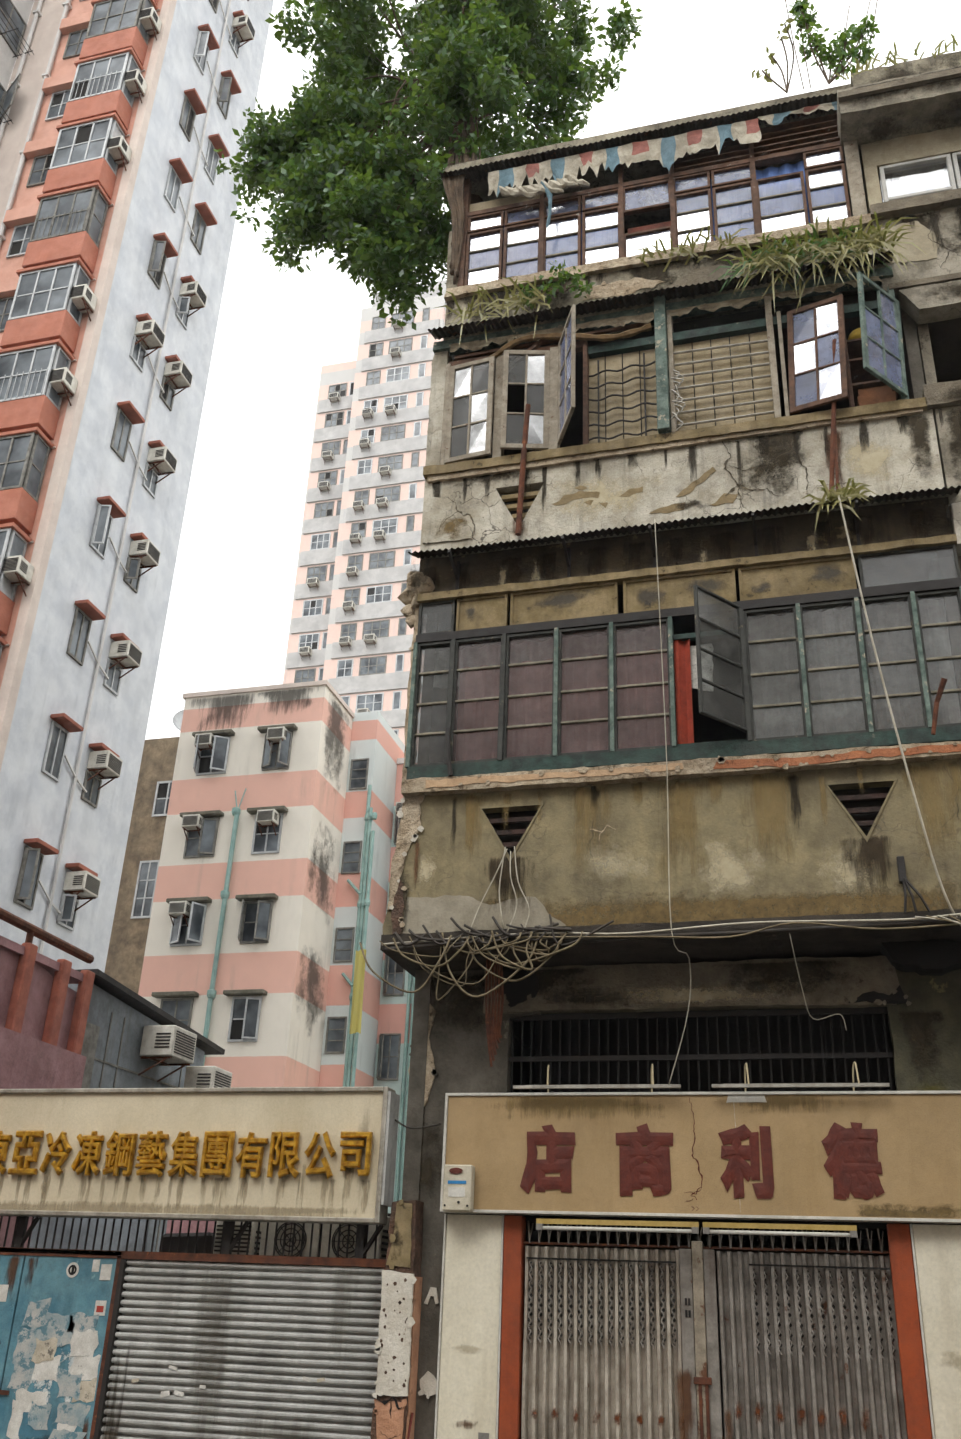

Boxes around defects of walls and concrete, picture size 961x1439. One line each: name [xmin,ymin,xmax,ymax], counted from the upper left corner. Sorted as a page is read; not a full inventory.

damp [854,58,961,140]
damp [900,214,931,228]
damp [904,388,961,466]
damp [743,431,804,493]
crack [439,497,475,534]
damp [325,701,346,773]
flaking render [710,742,961,771]
flaking render [387,763,683,934]
damp [545,777,956,926]
damp [631,989,745,1003]
corrosion [532,1371,692,1439]
corrosion [725,1404,869,1439]